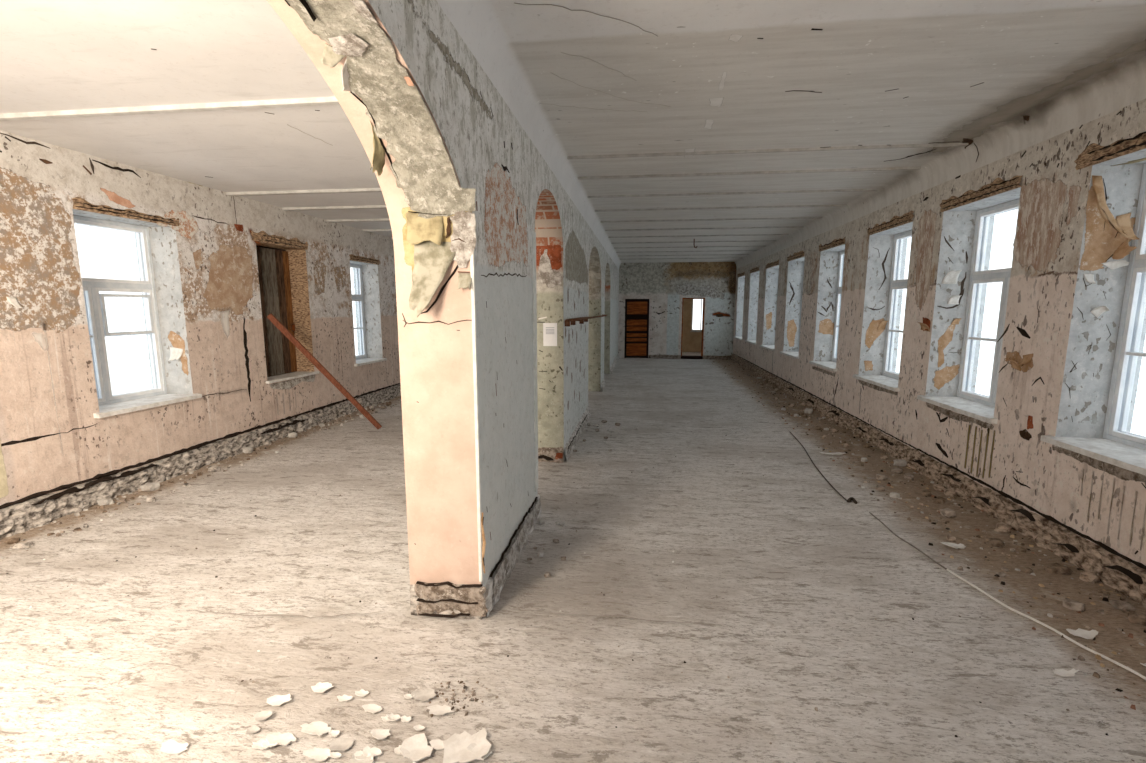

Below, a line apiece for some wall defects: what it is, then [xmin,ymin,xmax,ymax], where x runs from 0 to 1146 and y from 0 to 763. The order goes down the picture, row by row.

crack [515,3,657,36]
peeling [284,0,601,317]
spalling [0,167,82,333]
spalling [156,210,254,336]
spalling [538,414,590,461]
spalling [414,497,541,618]